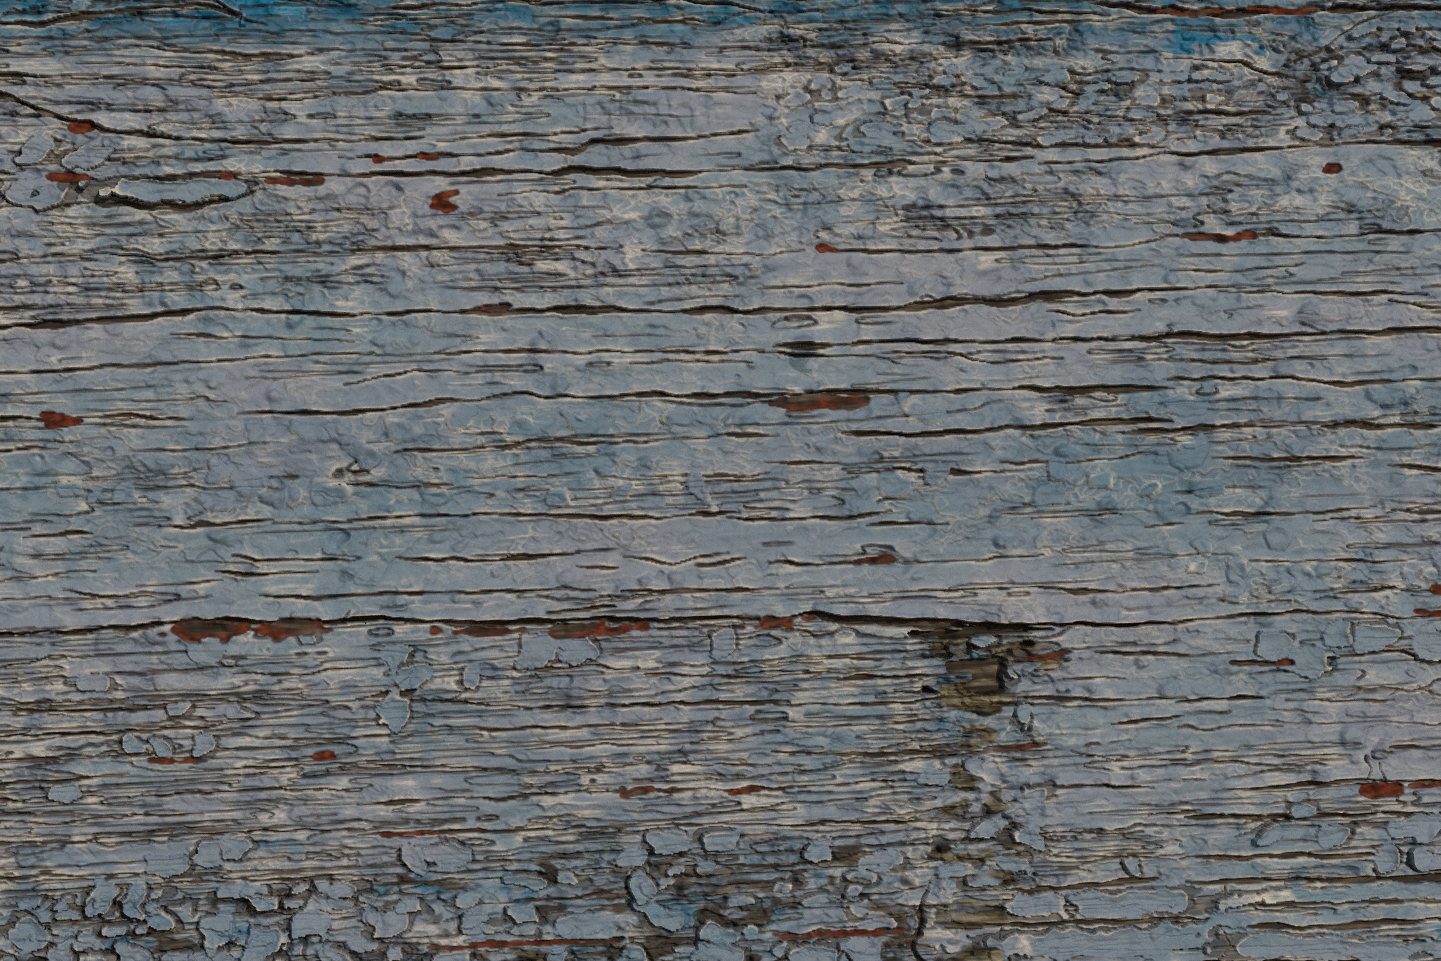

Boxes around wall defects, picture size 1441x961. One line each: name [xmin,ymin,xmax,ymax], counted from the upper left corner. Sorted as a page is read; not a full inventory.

peeling [0,131,248,212]
peeling [0,0,1441,191]
crack [0,0,1441,212]
peeling [171,638,229,664]
peeling [360,598,439,739]
peeling [515,621,608,691]
crack [0,230,1441,961]
peeling [21,764,83,804]
peeling [122,734,173,759]
peeling [193,733,217,757]
peeling [898,597,1441,961]
peeling [583,802,908,961]